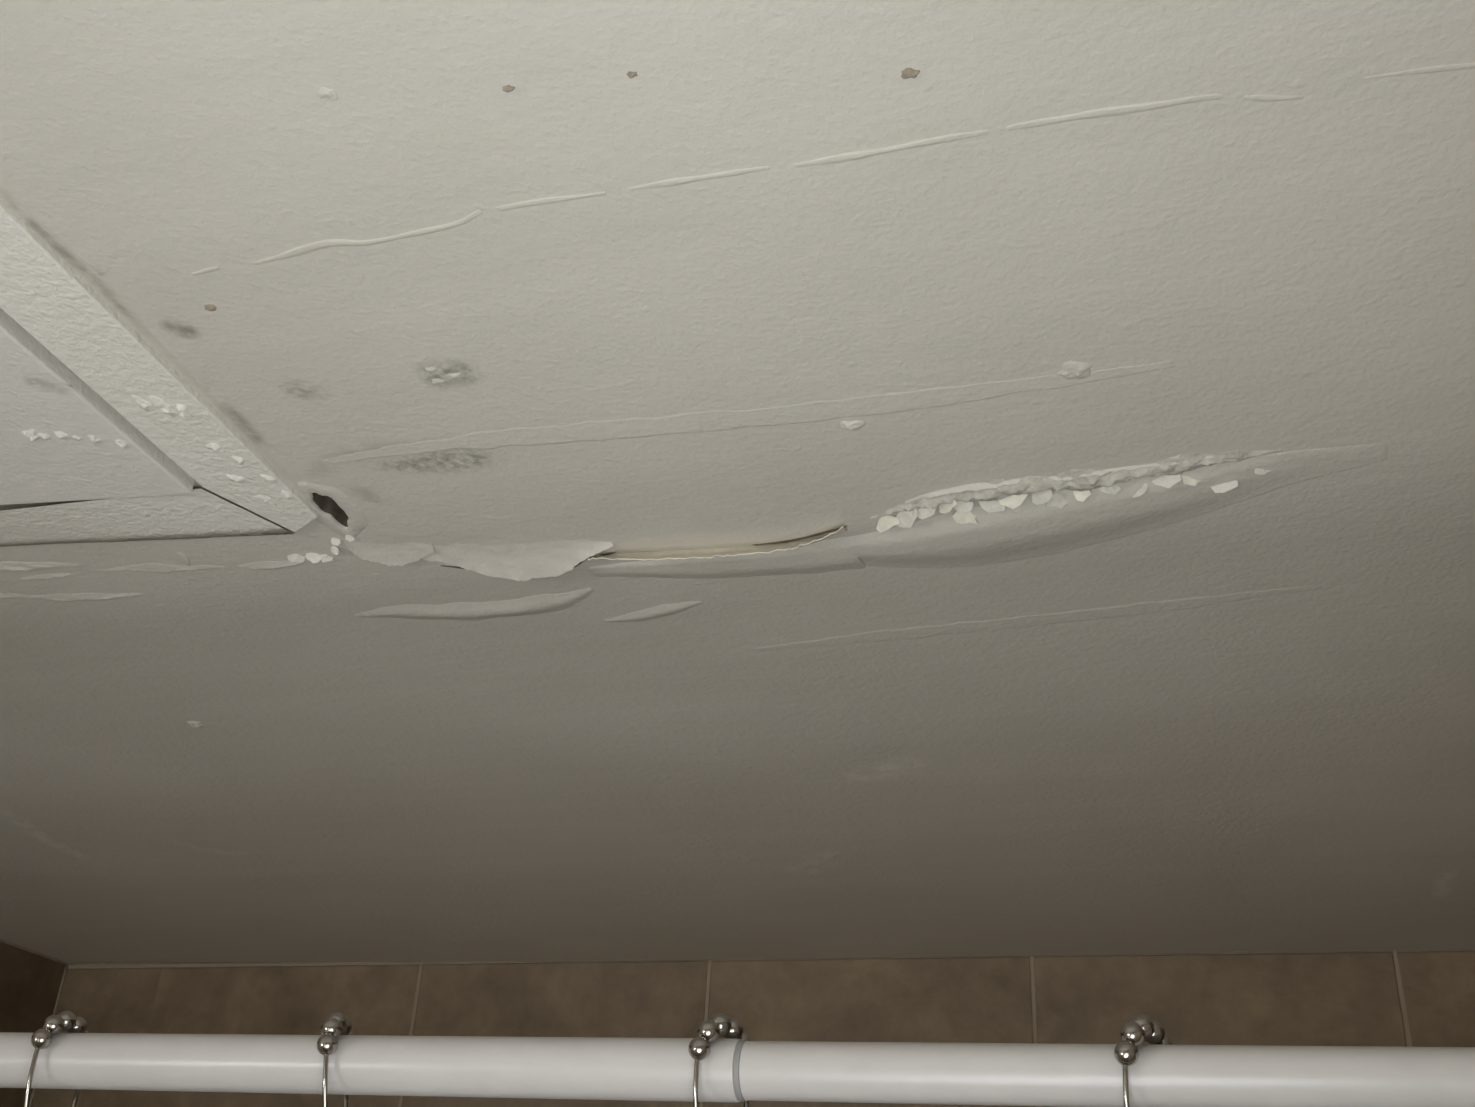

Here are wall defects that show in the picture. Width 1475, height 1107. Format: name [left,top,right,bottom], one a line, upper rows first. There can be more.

spalling [294,481,368,546]